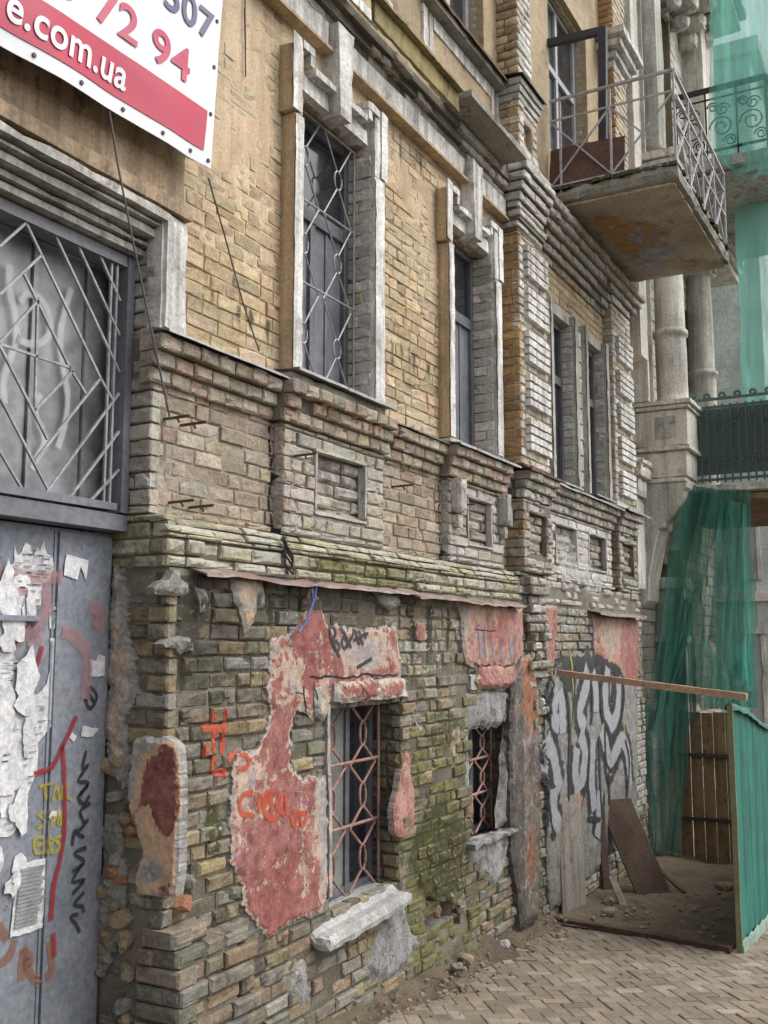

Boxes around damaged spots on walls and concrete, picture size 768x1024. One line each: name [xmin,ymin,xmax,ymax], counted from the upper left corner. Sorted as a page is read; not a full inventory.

flaking render [453,599,524,690]
flaking render [542,605,557,673]
flaking render [96,565,196,1024]
flaking render [223,577,404,942]
flaking render [387,750,415,839]